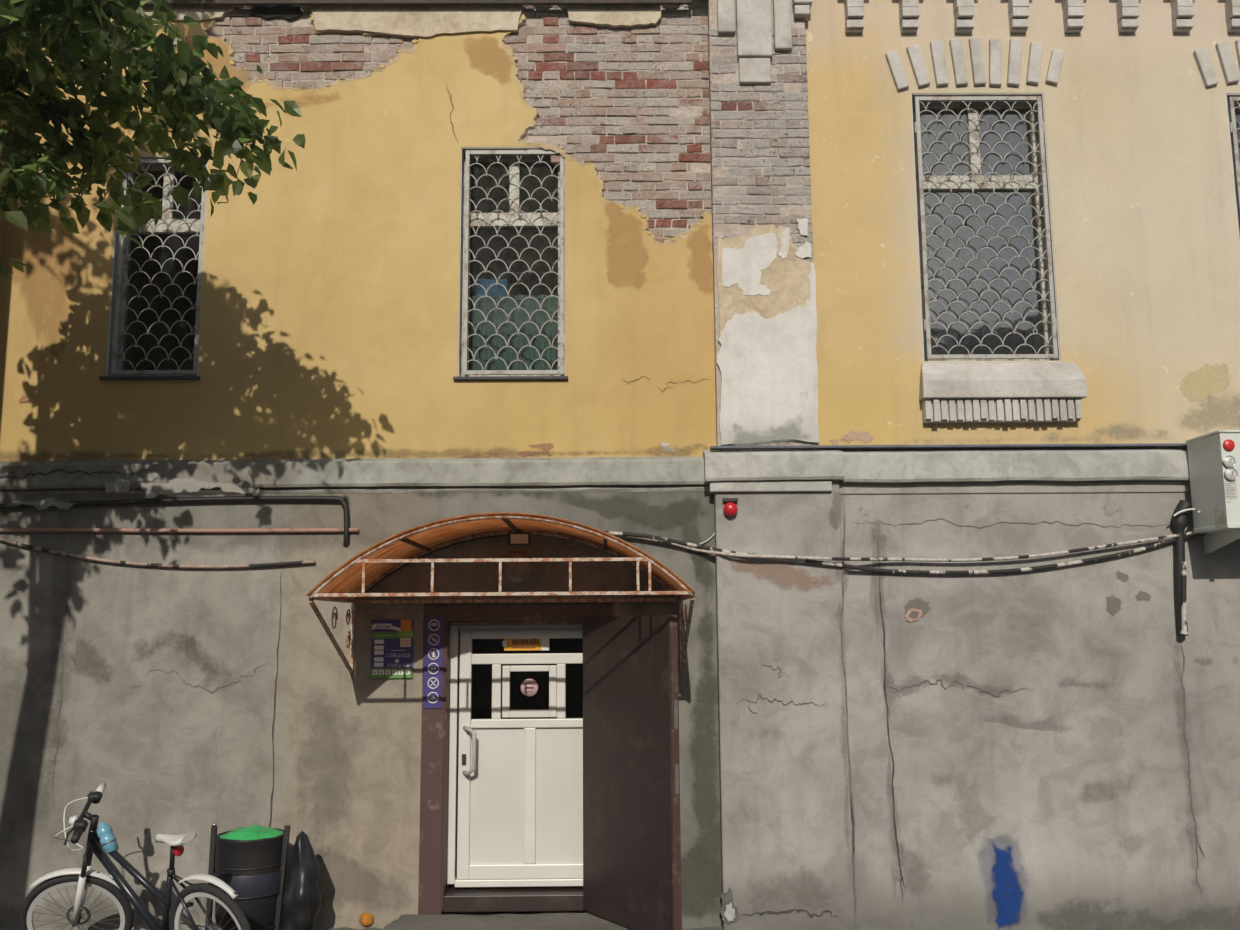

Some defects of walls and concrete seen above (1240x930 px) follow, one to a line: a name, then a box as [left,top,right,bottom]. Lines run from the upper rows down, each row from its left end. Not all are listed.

peeling [202,5,420,91]
crack [446,87,458,141]
peeling [500,0,813,338]
peeling [19,497,73,510]
crack [0,469,156,480]
peeling [104,473,259,499]
crack [736,517,1170,918]
crack [1179,637,1204,897]